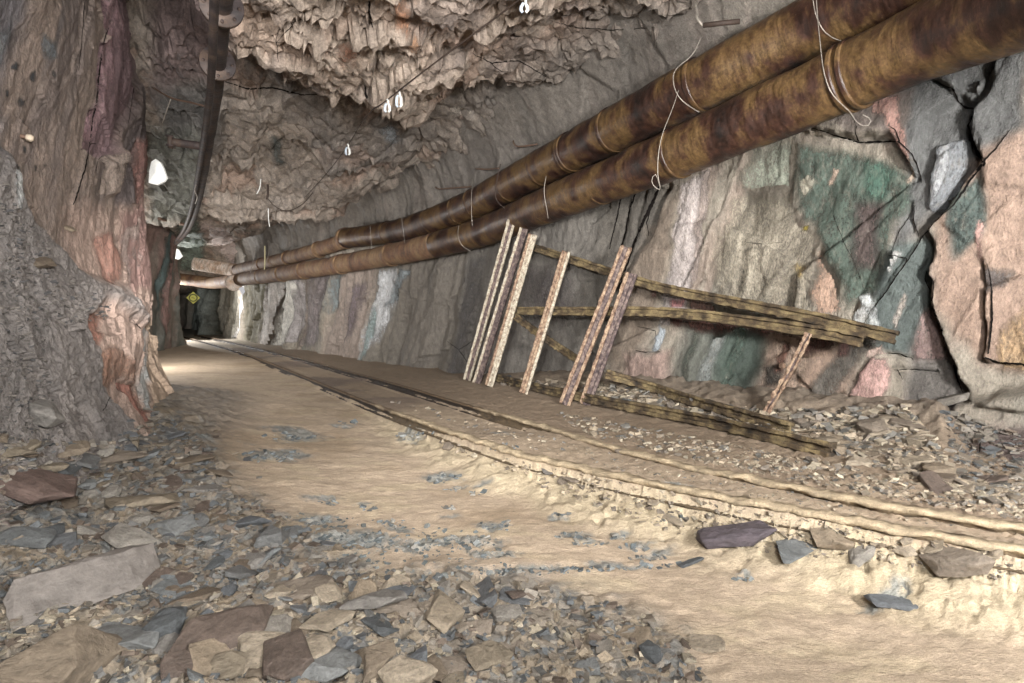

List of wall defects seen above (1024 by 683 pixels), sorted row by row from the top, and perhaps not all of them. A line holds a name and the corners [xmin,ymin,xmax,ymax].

crack [73,0,109,205]
crack [812,125,922,182]
crack [609,186,660,286]
crack [864,83,1010,331]
crack [985,265,1024,366]
crack [891,353,963,392]